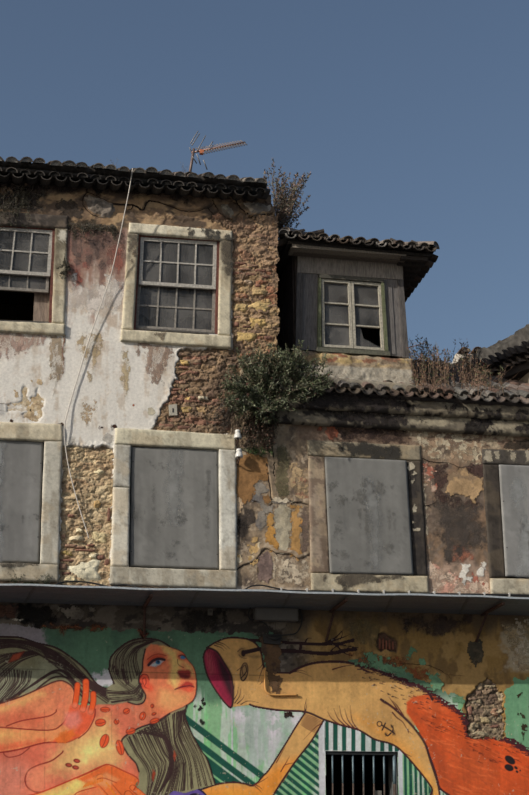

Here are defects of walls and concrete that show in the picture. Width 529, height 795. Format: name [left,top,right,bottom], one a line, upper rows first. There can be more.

crack [76,185,273,220]
flaking render [152,212,281,434]
flaking render [7,379,44,422]
flaking render [58,446,134,588]
flaking render [236,453,311,589]
peeling [405,430,486,549]
peeling [427,561,490,594]
peeling [355,646,444,691]
flaking render [450,679,504,740]